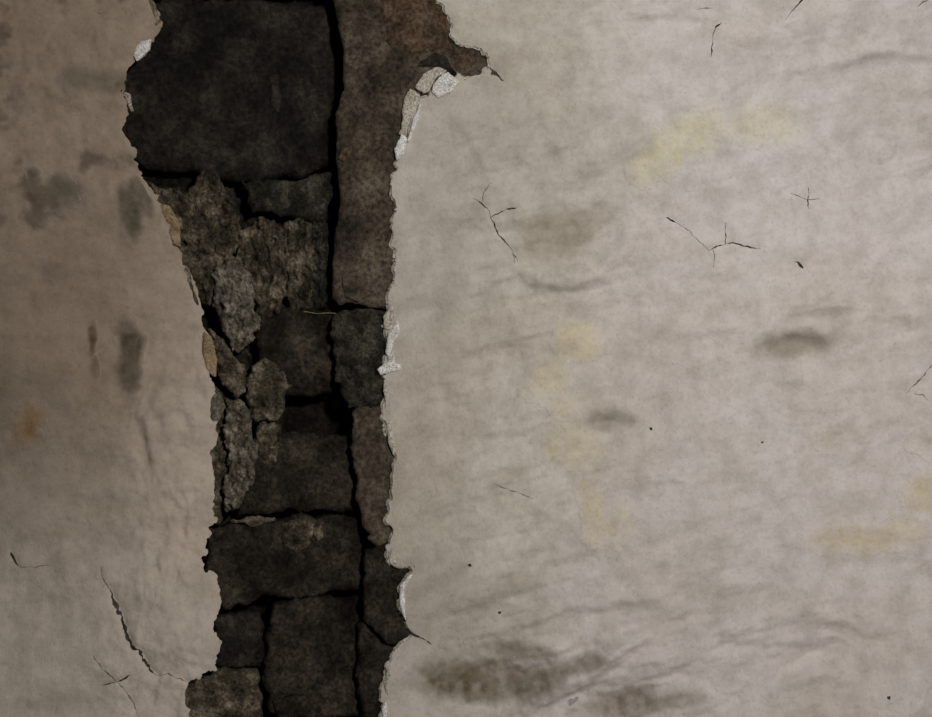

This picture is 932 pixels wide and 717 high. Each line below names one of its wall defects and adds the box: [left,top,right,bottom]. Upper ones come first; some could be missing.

peeling [149,0,161,26]
peeling [133,39,152,62]
peeling [160,204,181,247]
spalling [331,0,492,409]
crack [666,217,760,267]
peeling [202,332,218,377]
peeling [210,392,226,421]
peeling [386,420,396,456]
peeling [388,551,413,621]
peeling [381,667,392,717]
water stain [389,636,594,712]
water stain [546,679,727,717]